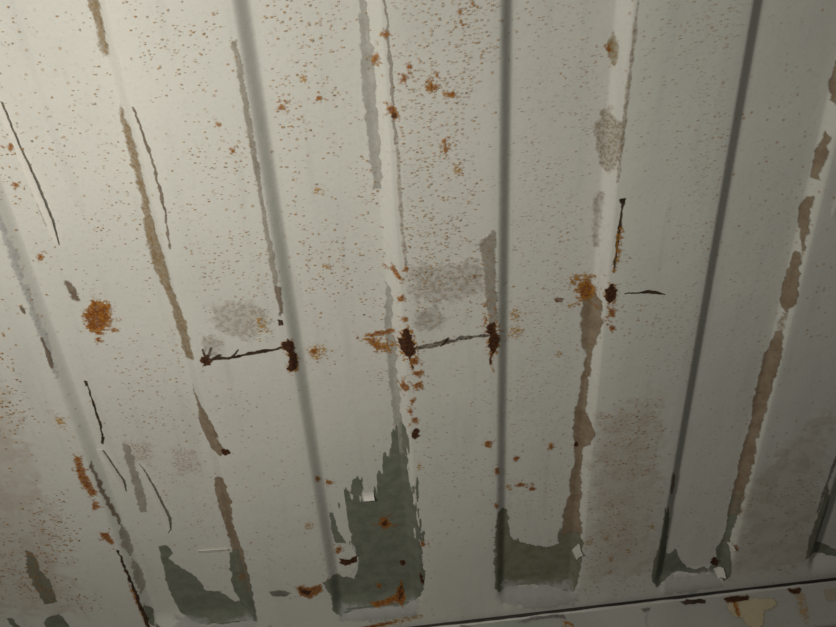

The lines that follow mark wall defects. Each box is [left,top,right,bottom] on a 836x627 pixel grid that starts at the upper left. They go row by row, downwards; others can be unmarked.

corrosion [263,0,366,151]
peeling [358,0,382,188]
corrosion [83,293,121,348]
peeling [89,444,170,627]
peeling [121,107,193,359]
peeling [159,477,257,627]
peeling [193,388,230,456]
peeling [323,285,425,620]
corrosion [296,0,499,390]
corrosion [399,357,500,497]
peeling [493,291,603,608]
peeling [652,196,814,594]